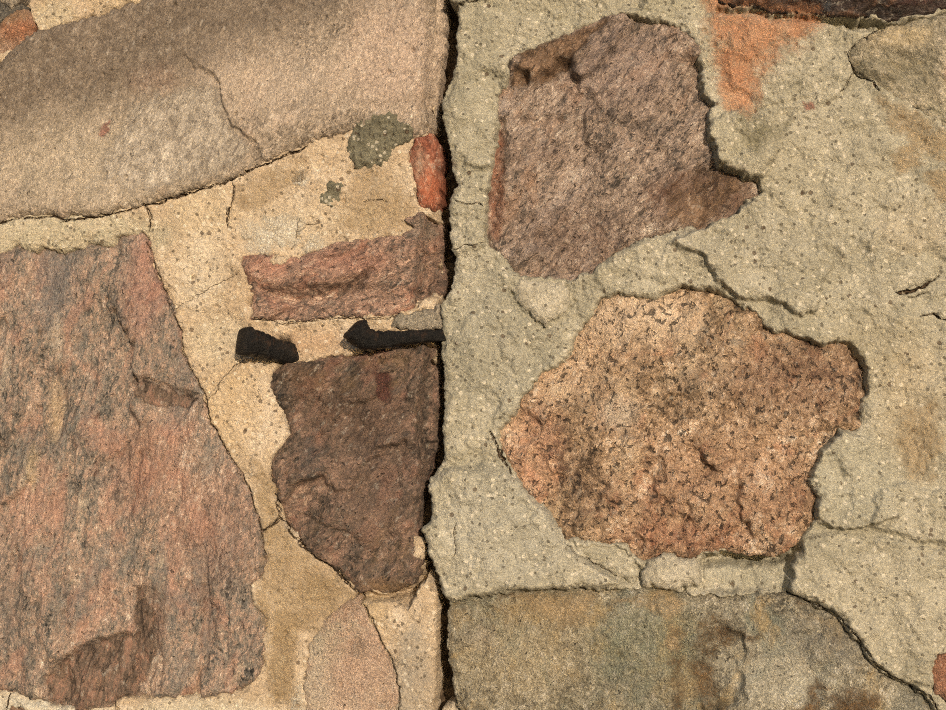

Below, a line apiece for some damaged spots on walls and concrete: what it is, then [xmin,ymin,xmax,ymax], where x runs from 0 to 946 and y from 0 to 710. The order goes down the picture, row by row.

crack [438,0,483,292]
crack [424,376,445,525]
crack [427,525,457,573]
crack [440,596,455,710]